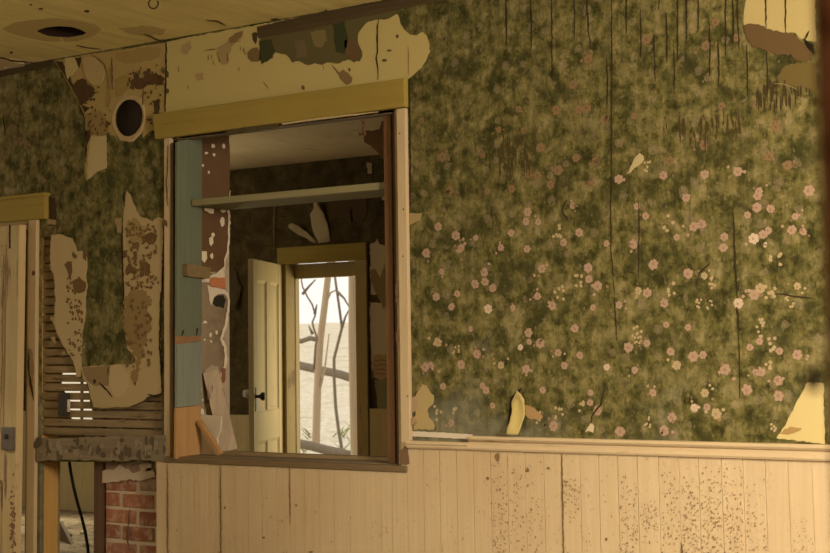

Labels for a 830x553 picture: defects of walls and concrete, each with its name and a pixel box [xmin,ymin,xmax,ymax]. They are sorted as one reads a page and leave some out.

flaking render [54,14,430,180]
water stain [677,107,744,150]
water stain [709,23,720,86]
water stain [746,44,811,116]
flaking render [743,0,815,53]
peeling [47,191,167,408]